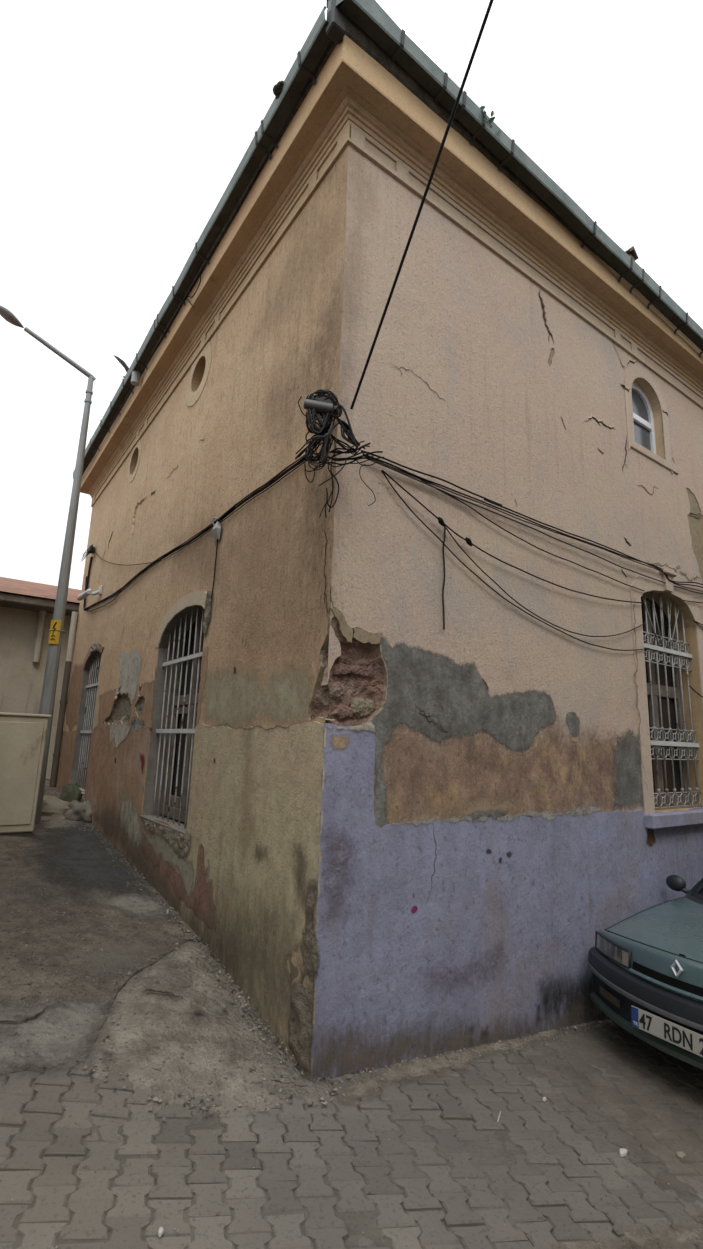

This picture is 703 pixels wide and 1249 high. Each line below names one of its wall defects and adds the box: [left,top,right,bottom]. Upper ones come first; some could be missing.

crack [539,289,555,344]
crack [561,415,655,495]
crack [98,465,178,584]
crack [322,525,330,619]
spalling [686,488,703,580]
peeling [97,681,154,731]
spalling [308,595,387,750]
peeling [382,704,616,826]
peeling [120,796,217,931]
water stain [313,997,604,1079]